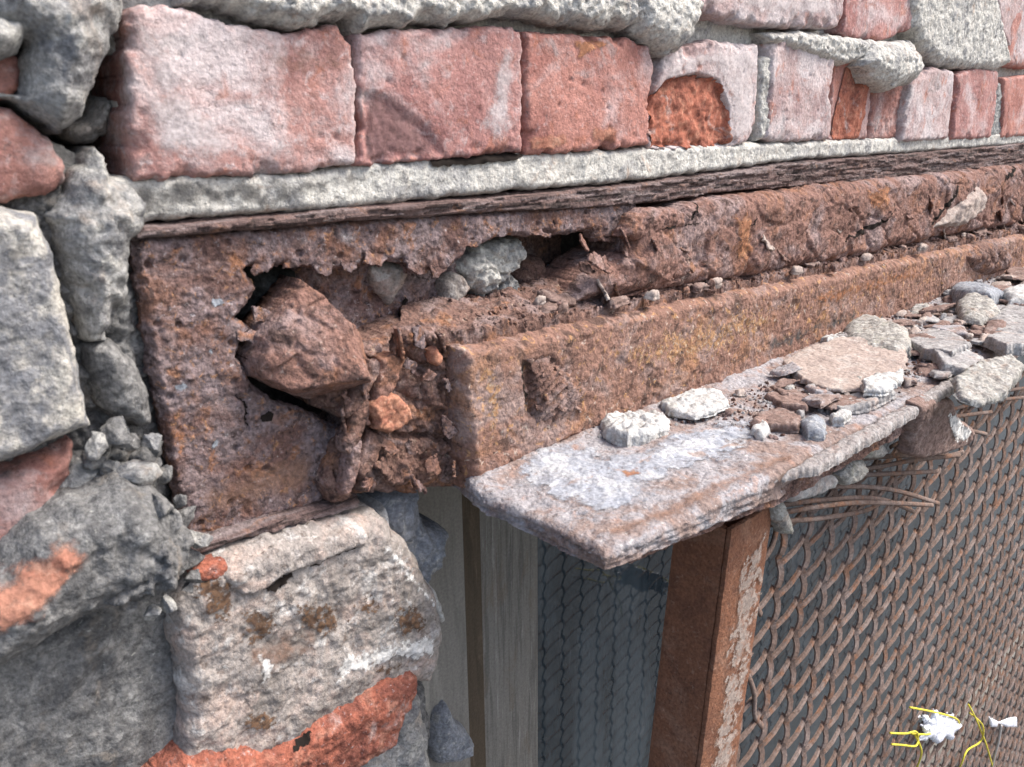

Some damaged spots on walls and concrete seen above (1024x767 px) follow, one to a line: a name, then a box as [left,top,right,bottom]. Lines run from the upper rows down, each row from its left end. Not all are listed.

rust [533,163,1024,314]
spalling [424,345,443,366]
spalling [260,411,274,422]
rust [334,351,405,495]
spalling [368,392,413,433]
rust [524,356,585,423]
spalling [799,409,852,442]
rust [628,289,1024,564]
peeling [832,445,888,485]
peeling [715,502,794,767]